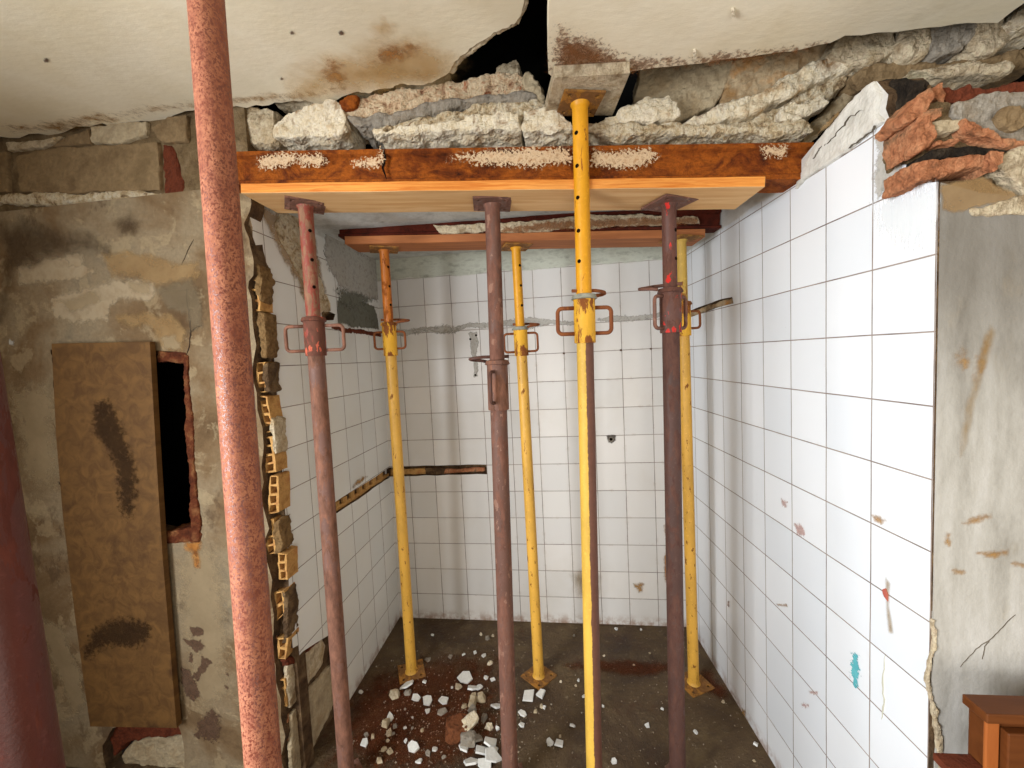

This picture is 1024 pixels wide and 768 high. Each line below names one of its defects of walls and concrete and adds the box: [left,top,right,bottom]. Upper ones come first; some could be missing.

rust [316,45,438,86]
spalling [396,0,529,89]
rust [548,24,827,74]
peeling [275,100,313,114]
peeling [349,90,382,99]
peeling [795,78,929,189]
leakage [3,229,69,268]
spalling [264,209,305,300]
crack [960,615,1015,667]
spalling [923,618,943,768]